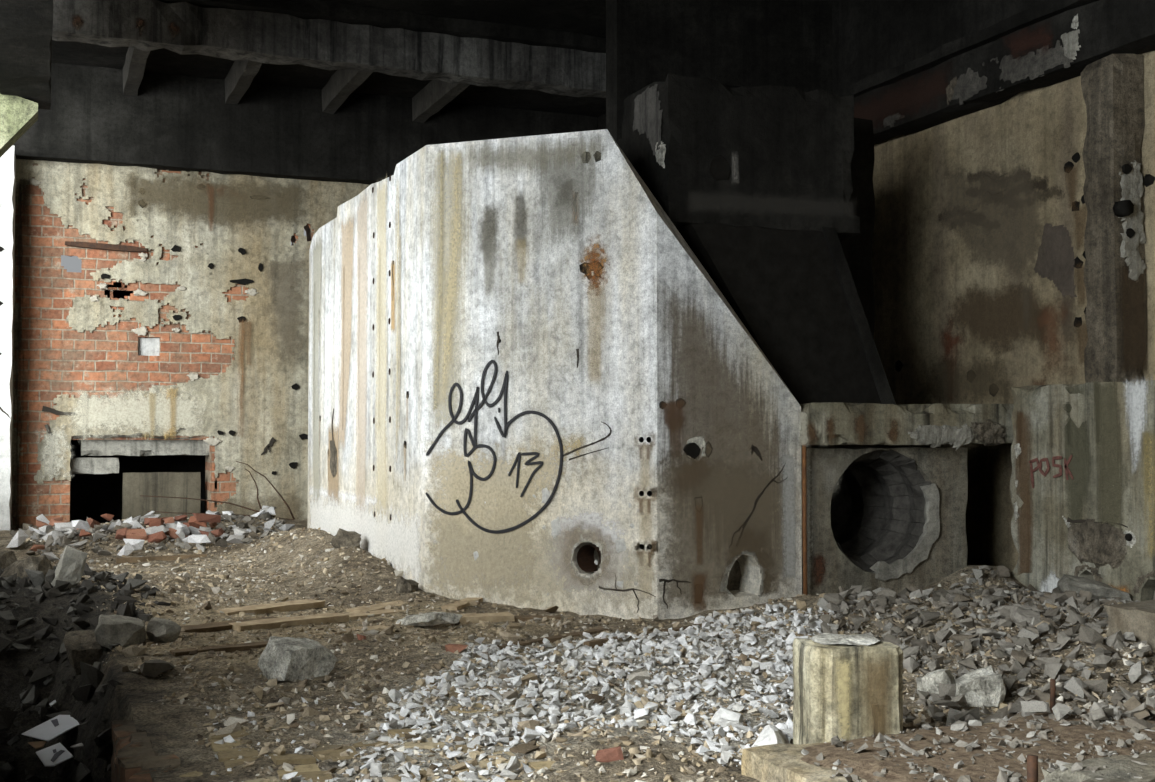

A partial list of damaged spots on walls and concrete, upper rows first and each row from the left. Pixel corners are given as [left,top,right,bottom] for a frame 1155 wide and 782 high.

peeling [946,14,1081,105]
spalling [1118,160,1146,281]
flaking render [222,263,263,302]
rust [582,243,607,293]
flaking render [0,177,239,528]
spalling [1062,516,1136,582]